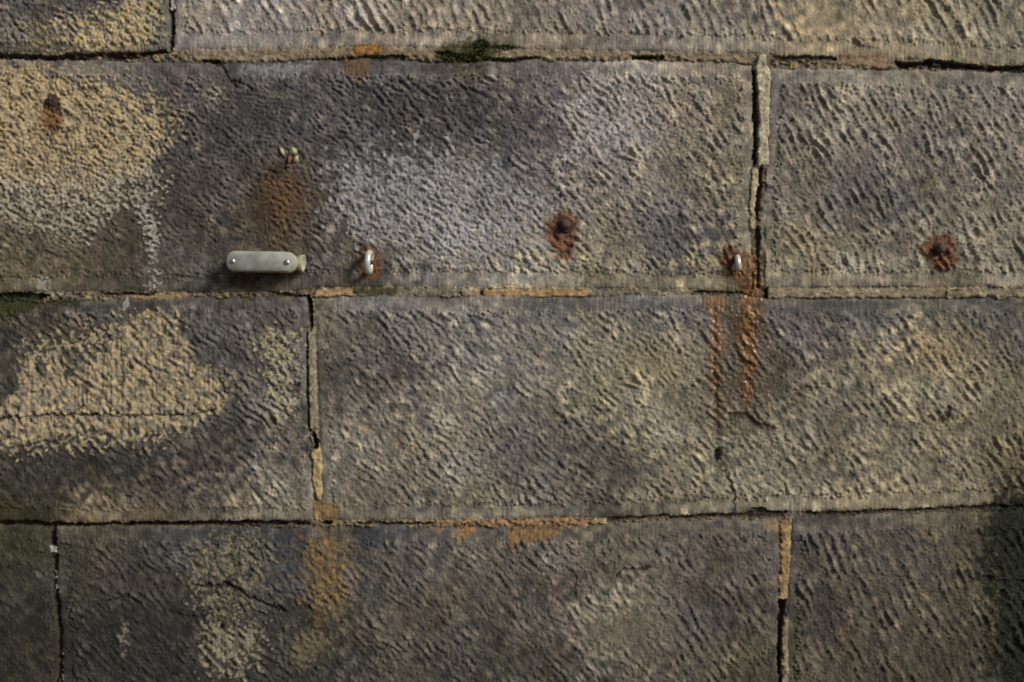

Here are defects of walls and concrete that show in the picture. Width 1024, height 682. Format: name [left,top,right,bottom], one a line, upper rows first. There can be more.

rust [41,97,63,134]
rust [260,163,311,232]
rust [357,245,381,278]
rust [547,211,579,258]
rust [921,234,960,273]
rust [703,245,767,421]
crack [0,409,214,420]